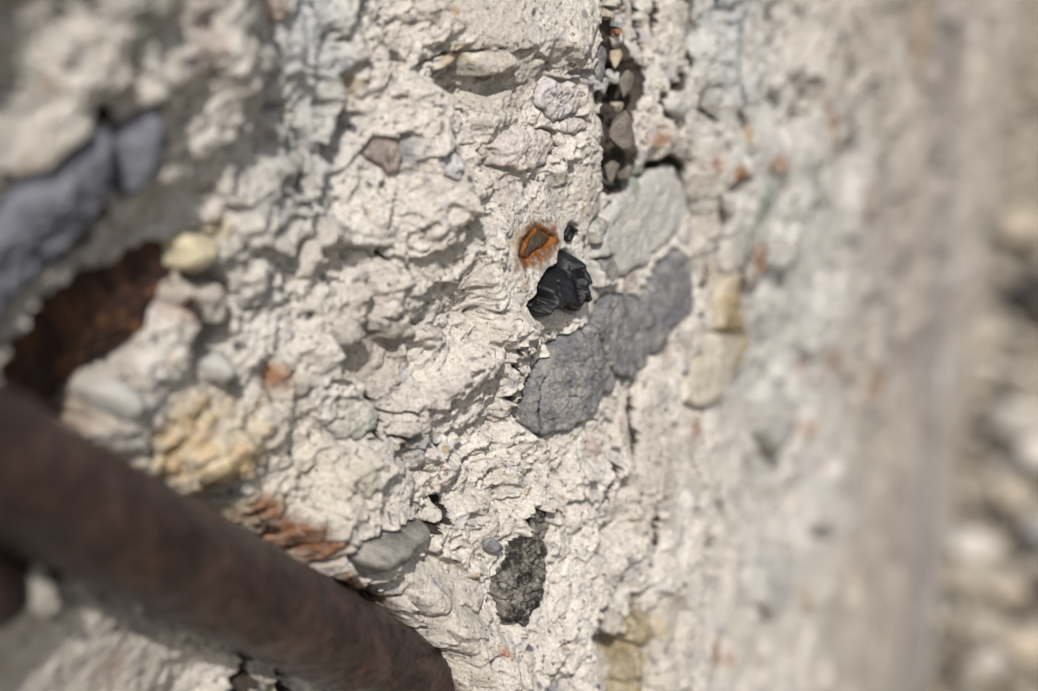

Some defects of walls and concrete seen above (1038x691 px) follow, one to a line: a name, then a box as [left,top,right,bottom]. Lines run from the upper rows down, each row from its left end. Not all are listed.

crack [593,0,764,215]
corrosion [515,219,559,269]
crack [698,207,796,291]
spalling [41,314,150,427]
corrosion [0,239,455,691]
crack [226,651,291,691]